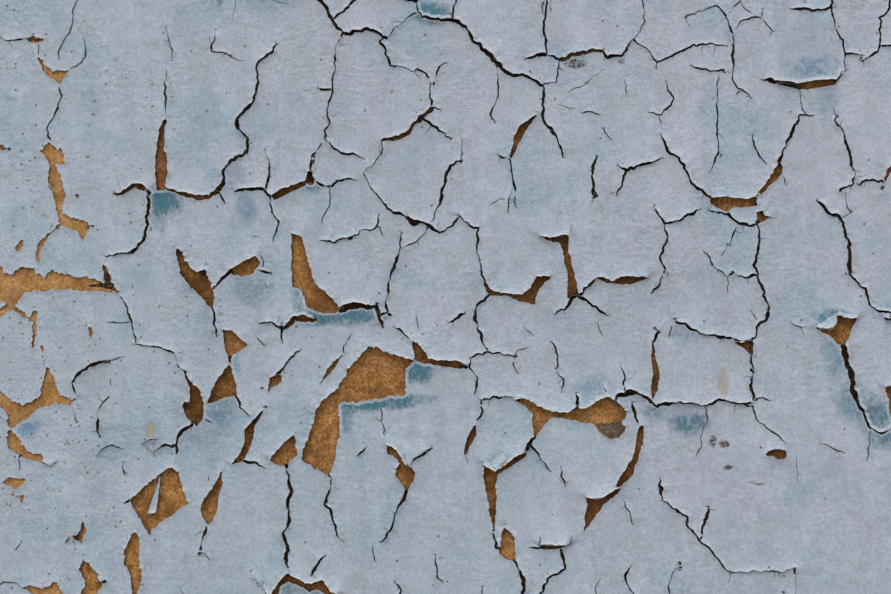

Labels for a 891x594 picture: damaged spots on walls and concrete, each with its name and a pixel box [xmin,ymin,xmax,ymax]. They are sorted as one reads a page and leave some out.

crack [104,0,284,289]
crack [304,0,891,396]
peeling [0,140,123,505]
peeling [19,518,111,594]
crack [67,293,197,476]
peeling [121,229,468,594]
crack [278,463,347,578]
peeling [461,383,648,564]
peeling [647,327,663,402]
crack [613,203,798,481]
crack [655,477,800,594]
peeling [790,311,891,438]